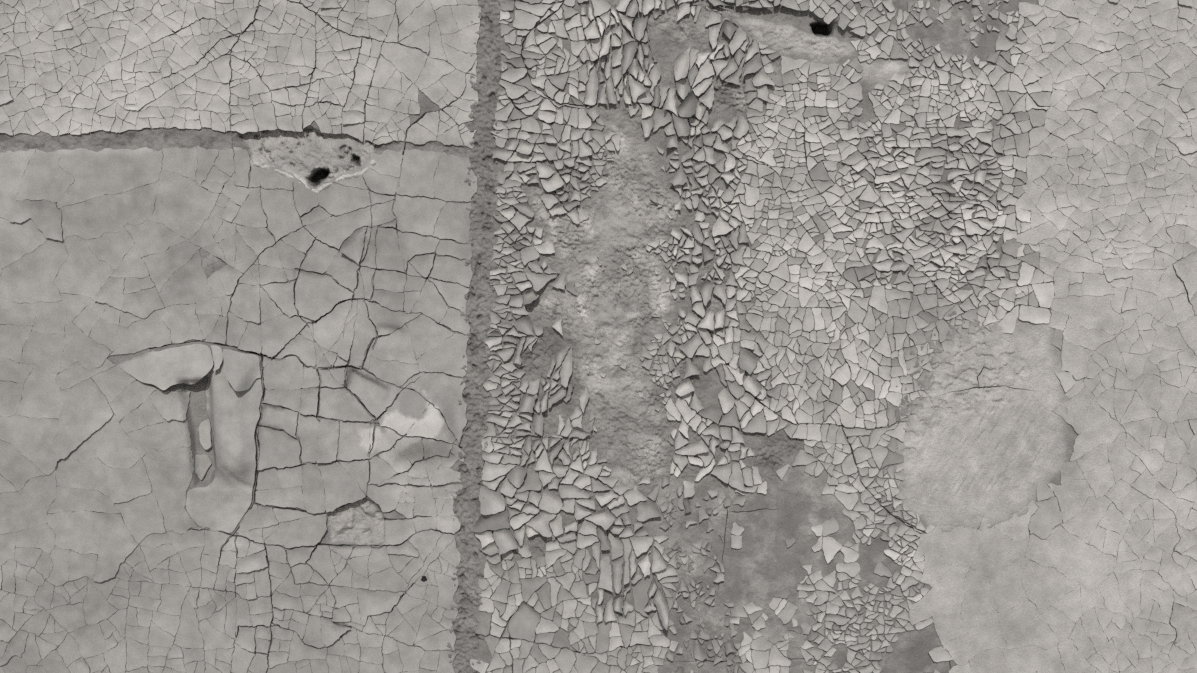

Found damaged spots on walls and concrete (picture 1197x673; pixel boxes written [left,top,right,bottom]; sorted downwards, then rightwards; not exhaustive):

peeling [0,0,481,673]
crack [149,124,467,673]
crack [171,0,475,155]
peeling [470,0,1197,673]
crack [942,367,1032,395]